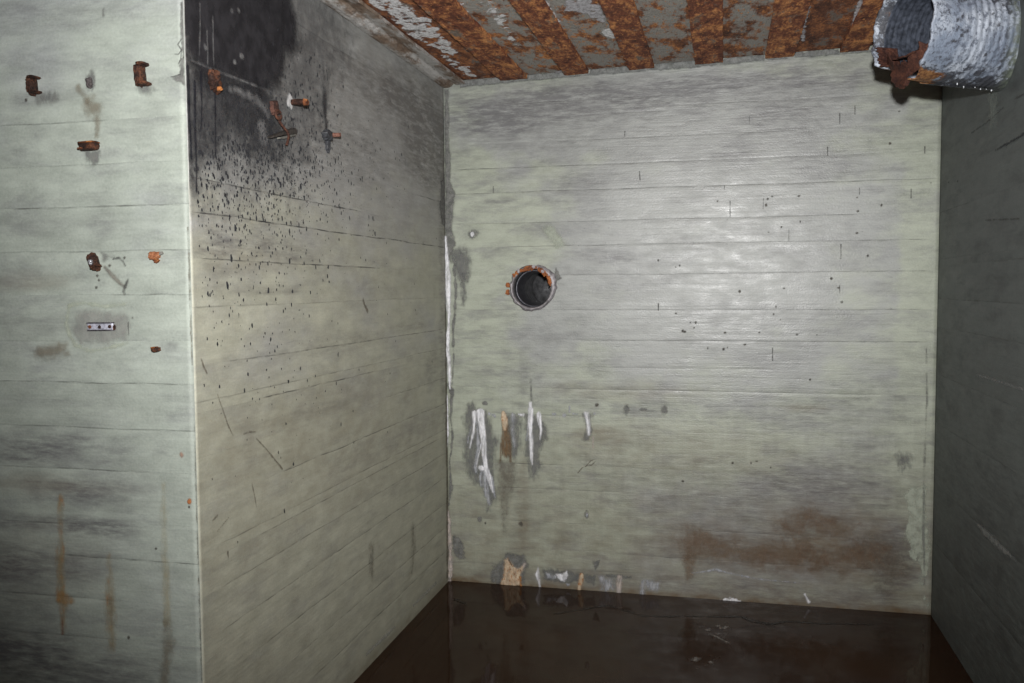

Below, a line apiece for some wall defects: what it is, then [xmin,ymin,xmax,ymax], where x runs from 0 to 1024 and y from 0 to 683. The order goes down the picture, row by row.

leakage [450,250,469,305]
rust [505,265,552,295]
leakage [464,402,595,508]
spalling [491,553,528,586]